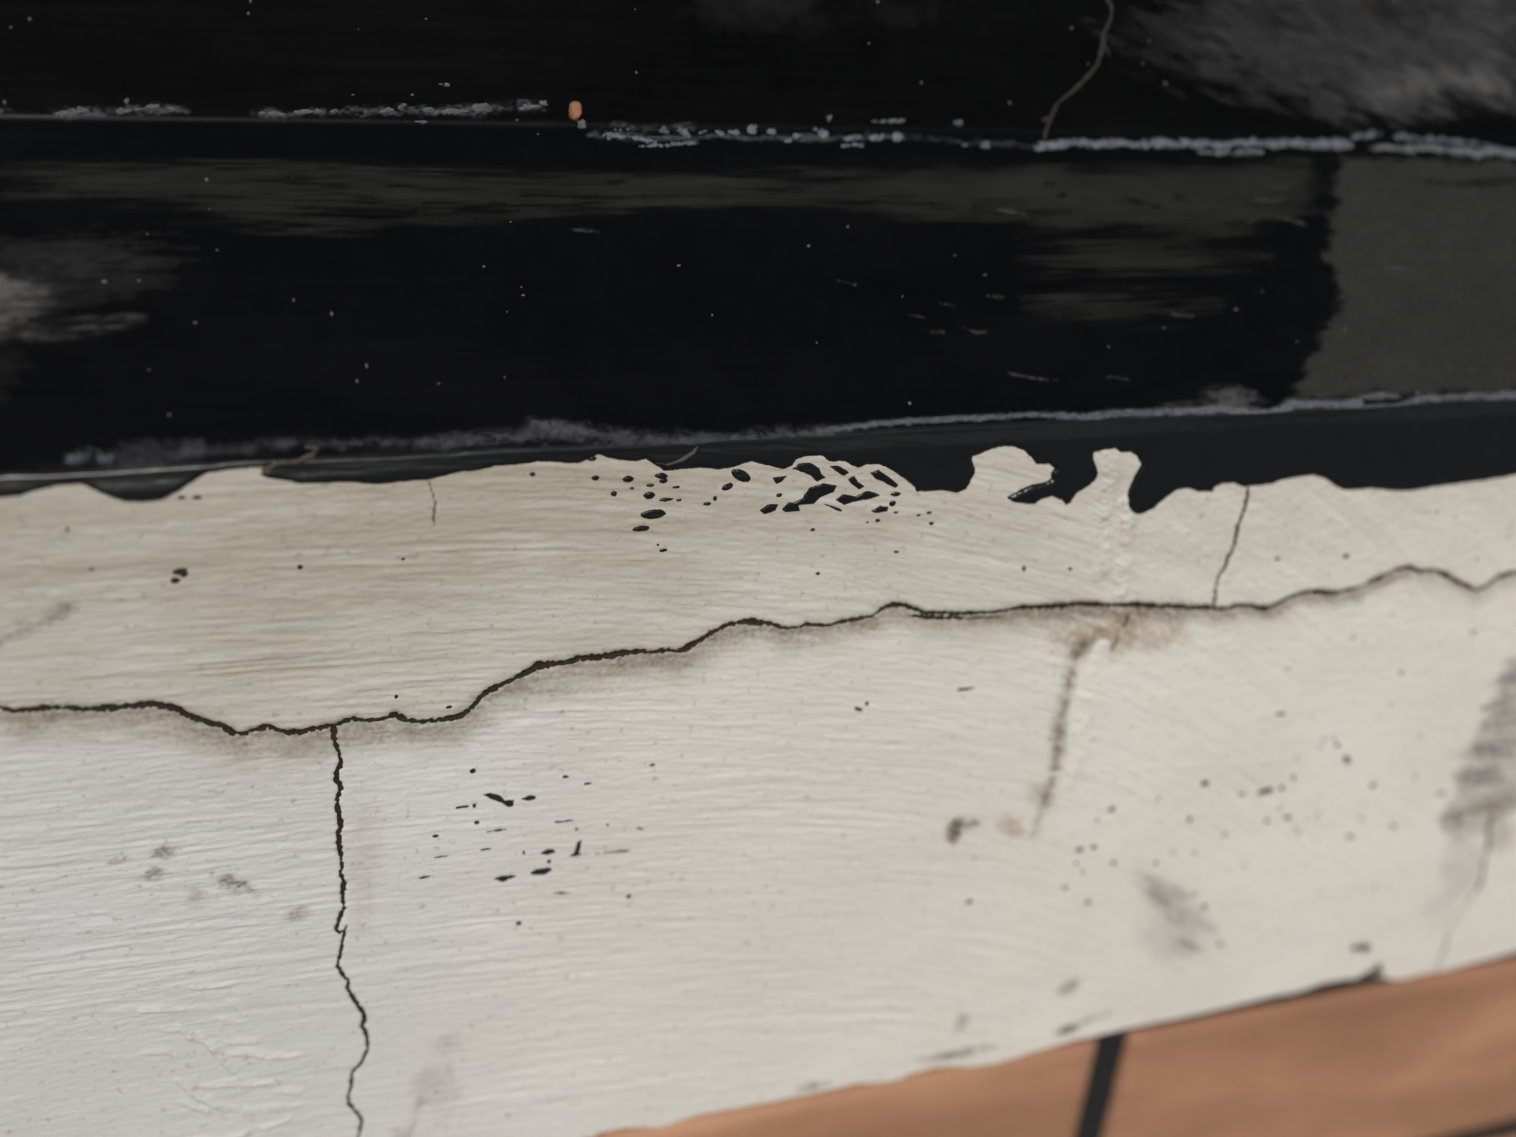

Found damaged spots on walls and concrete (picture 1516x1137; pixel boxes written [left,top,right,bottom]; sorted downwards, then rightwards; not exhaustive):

crack [1042,0,1114,139]
peeling [0,398,1516,532]
water stain [1054,643,1084,752]
crack [0,481,1516,1137]
water stain [1238,757,1304,834]